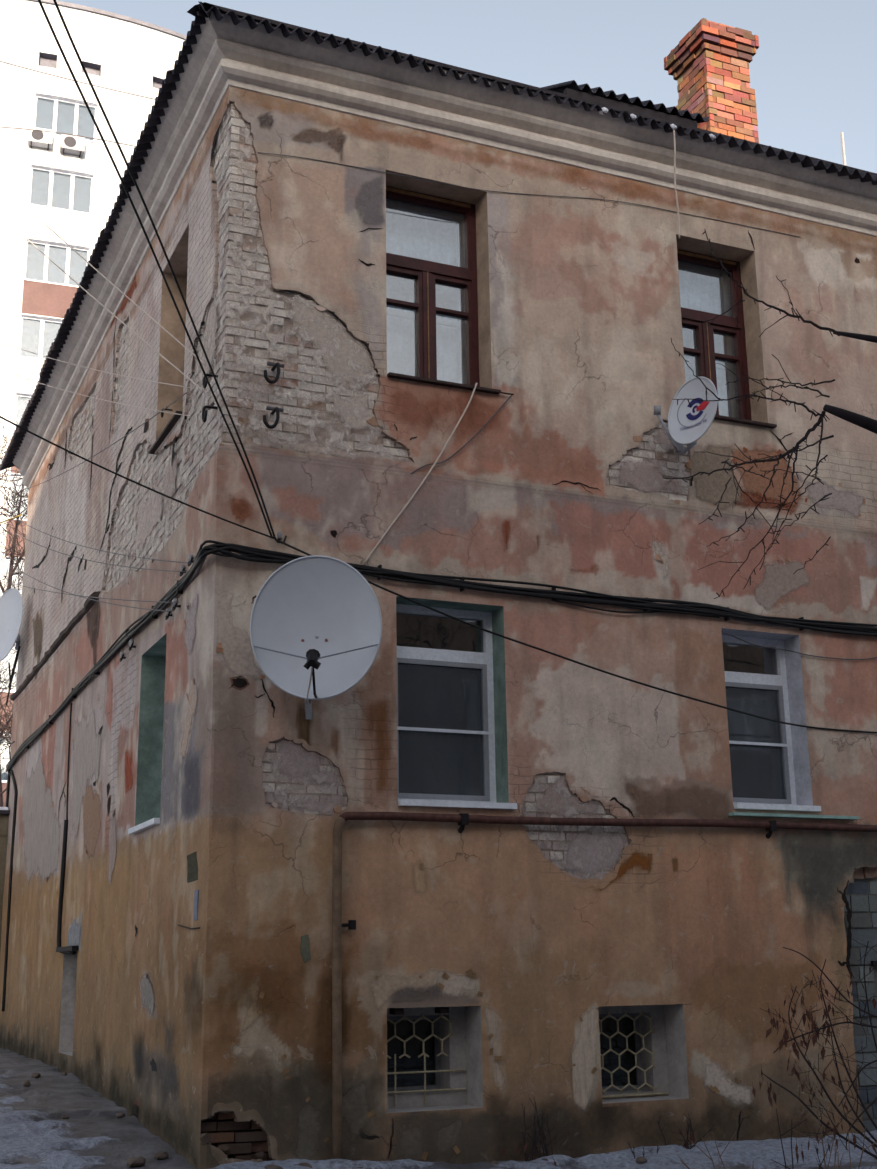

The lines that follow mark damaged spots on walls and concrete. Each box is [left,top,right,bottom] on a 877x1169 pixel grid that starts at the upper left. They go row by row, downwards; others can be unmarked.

spalling [103,103,412,592]
crack [32,319,132,600]
spalling [605,422,866,517]
peeling [22,710,116,883]
spalling [262,737,347,816]
spalling [520,772,631,880]
leakage [0,1033,195,1161]
spalling [199,1111,272,1161]